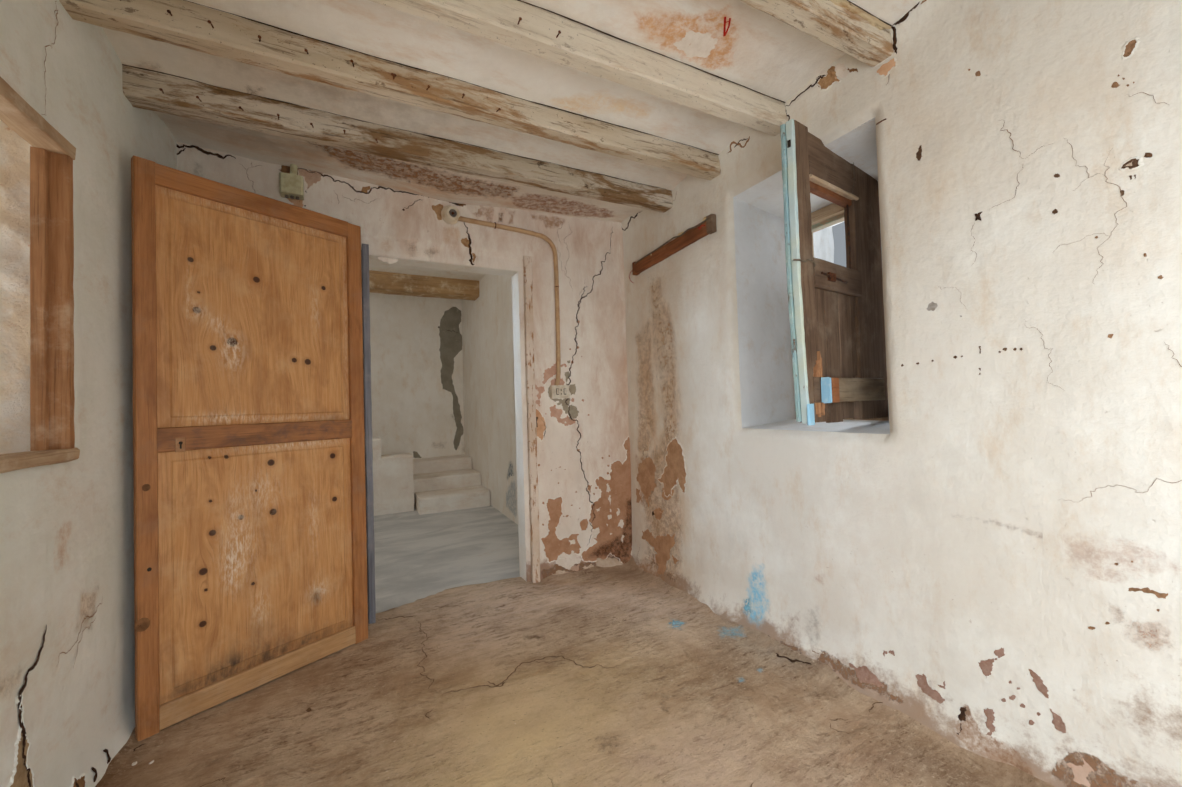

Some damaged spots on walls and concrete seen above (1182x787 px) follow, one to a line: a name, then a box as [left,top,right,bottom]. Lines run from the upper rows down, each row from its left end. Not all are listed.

crack [185,0,750,174]
crack [518,0,823,121]
leakage [624,0,748,76]
crack [939,122,1127,306]
crack [122,64,677,543]
flaking render [538,436,687,592]
leakage [1042,520,1182,602]
crack [7,594,103,787]
flaking render [71,749,111,787]
flaking render [768,635,902,703]
flaking render [978,648,1005,678]
flaking render [916,669,1137,787]